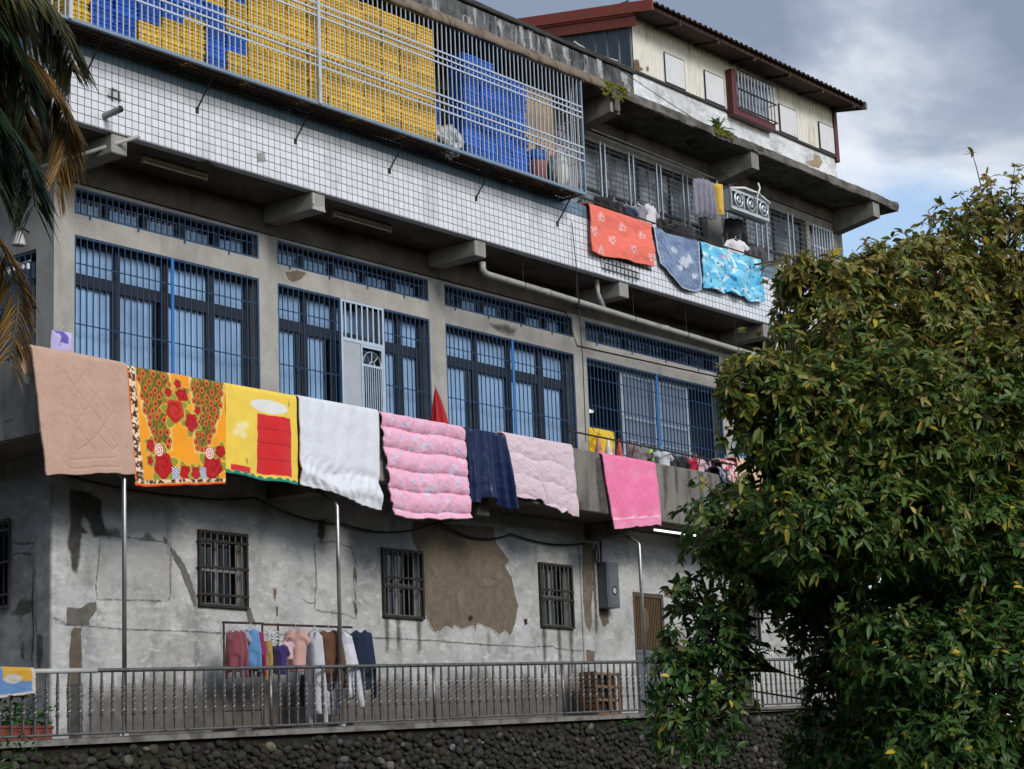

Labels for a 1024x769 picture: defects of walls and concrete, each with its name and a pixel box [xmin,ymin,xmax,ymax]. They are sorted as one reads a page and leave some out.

peeling [807,154,822,168]
crack [13,533,226,660]
crack [305,540,583,651]
peeling [412,522,527,636]